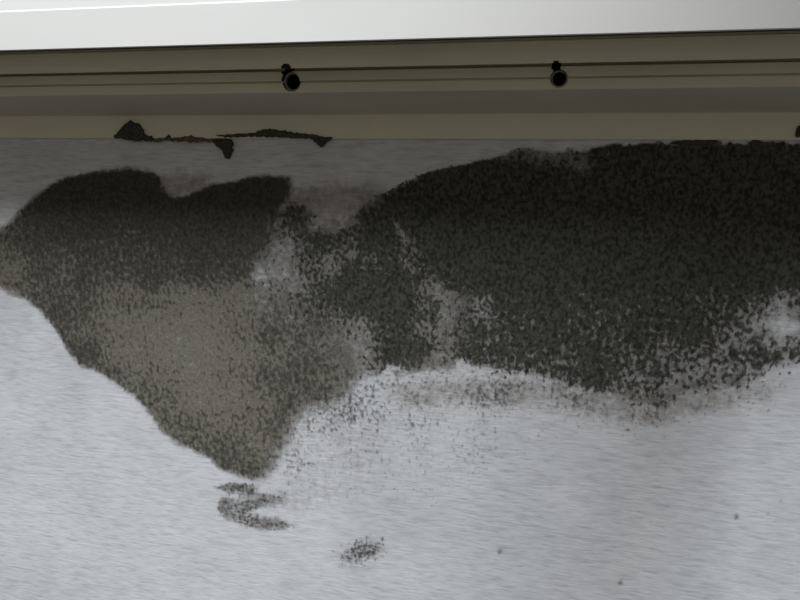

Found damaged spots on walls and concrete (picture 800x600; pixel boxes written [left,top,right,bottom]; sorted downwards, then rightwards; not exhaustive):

leakage [0,141,800,529]